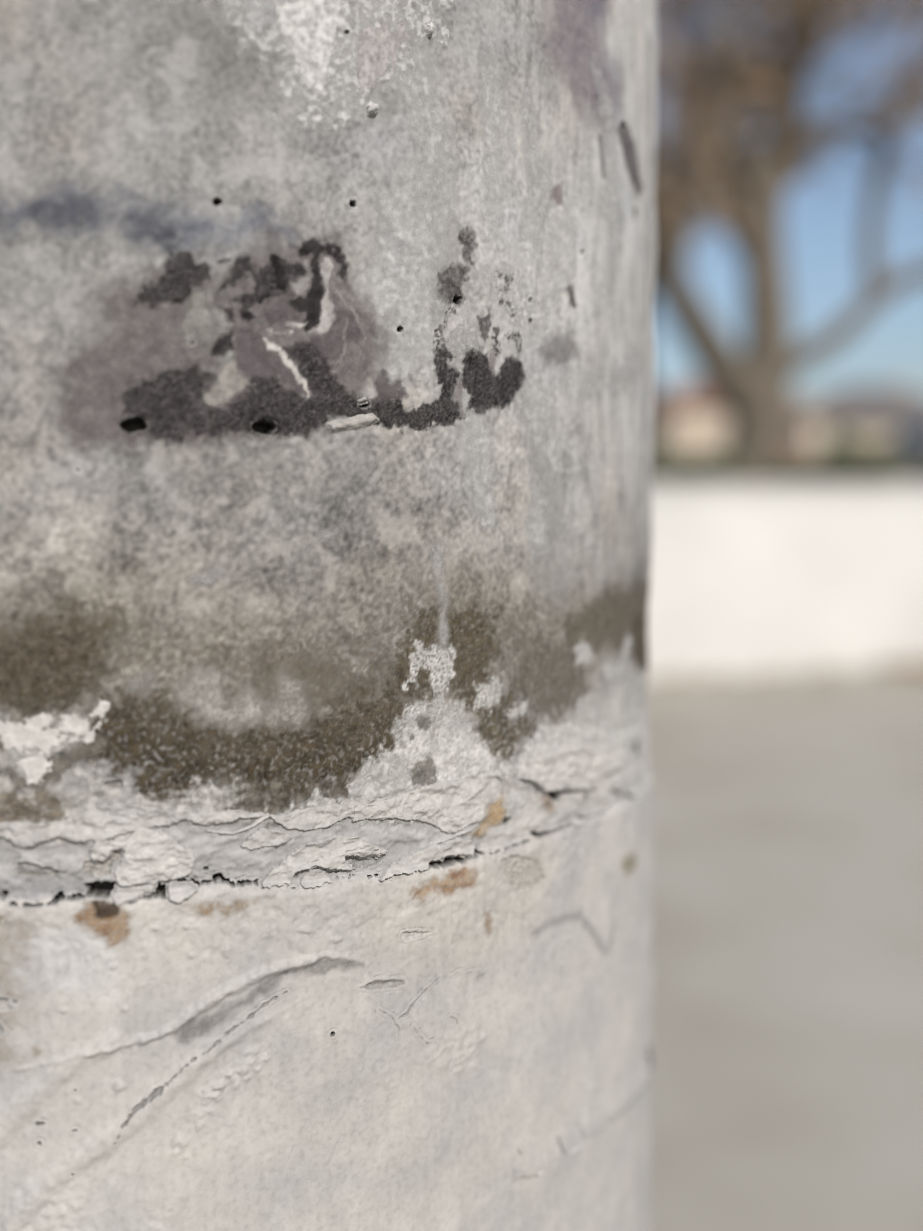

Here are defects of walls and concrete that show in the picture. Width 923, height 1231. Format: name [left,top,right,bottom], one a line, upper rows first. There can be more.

leakage [63,0,577,588]
leakage [553,0,652,536]
leakage [0,538,651,831]
corrosion [76,901,129,945]
peeling [0,776,501,907]
crack [0,773,638,913]
spalling [496,851,549,896]
peeling [516,740,642,827]